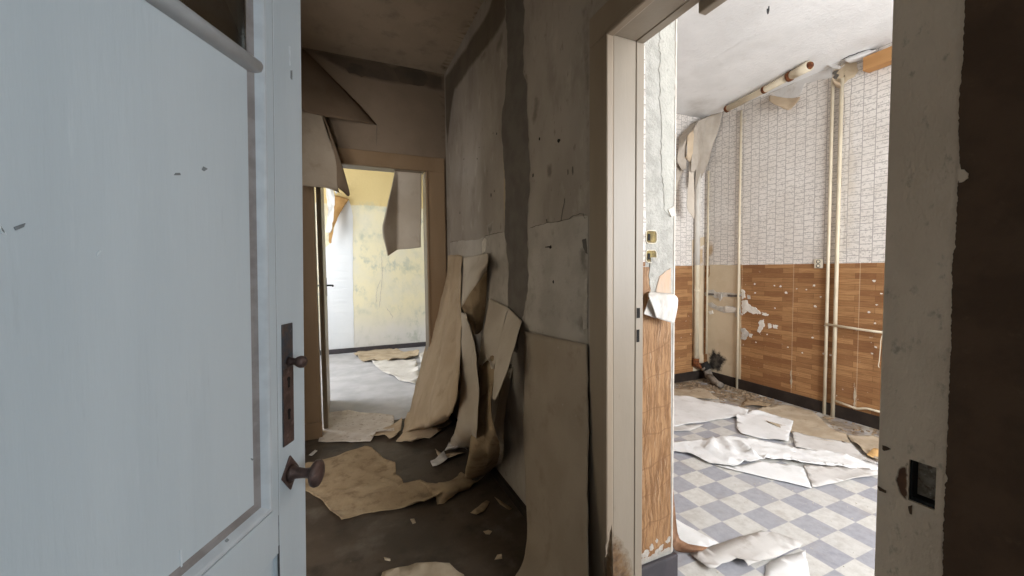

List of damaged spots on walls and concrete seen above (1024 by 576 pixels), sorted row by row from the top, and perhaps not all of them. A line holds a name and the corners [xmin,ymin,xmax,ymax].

peeling [290,49,376,125]
peeling [658,24,675,217]
peeling [769,95,800,110]
flaking render [705,283,778,343]